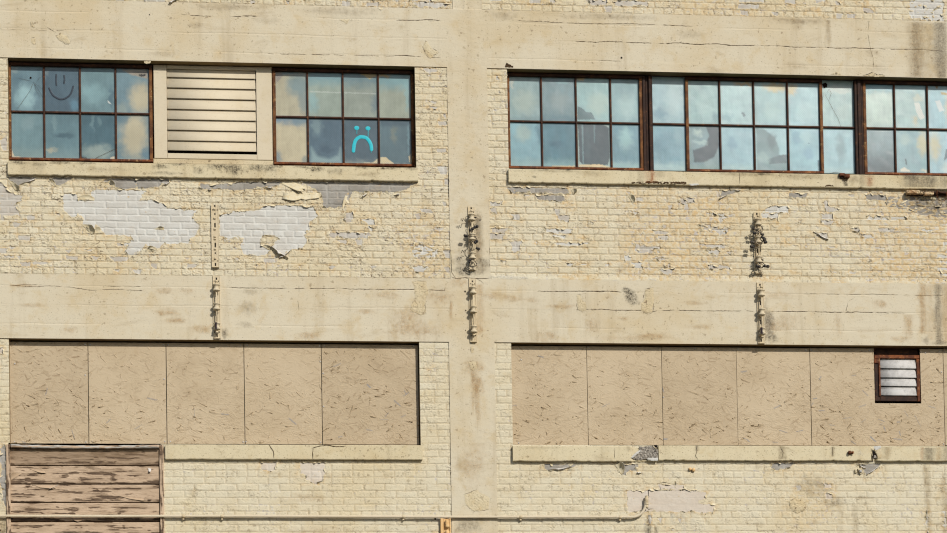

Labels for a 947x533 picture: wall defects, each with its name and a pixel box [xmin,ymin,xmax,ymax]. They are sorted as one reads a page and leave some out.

peeling [587,0,650,13]
peeling [908,0,945,21]
peeling [0,175,48,267]
peeling [48,176,199,274]
peeling [198,180,415,268]
peeling [626,181,699,214]
peeling [761,191,808,222]
peeling [813,199,841,248]
peeling [848,192,947,281]
corrosion [905,190,947,202]
spalling [615,445,658,475]
peeling [625,481,717,531]